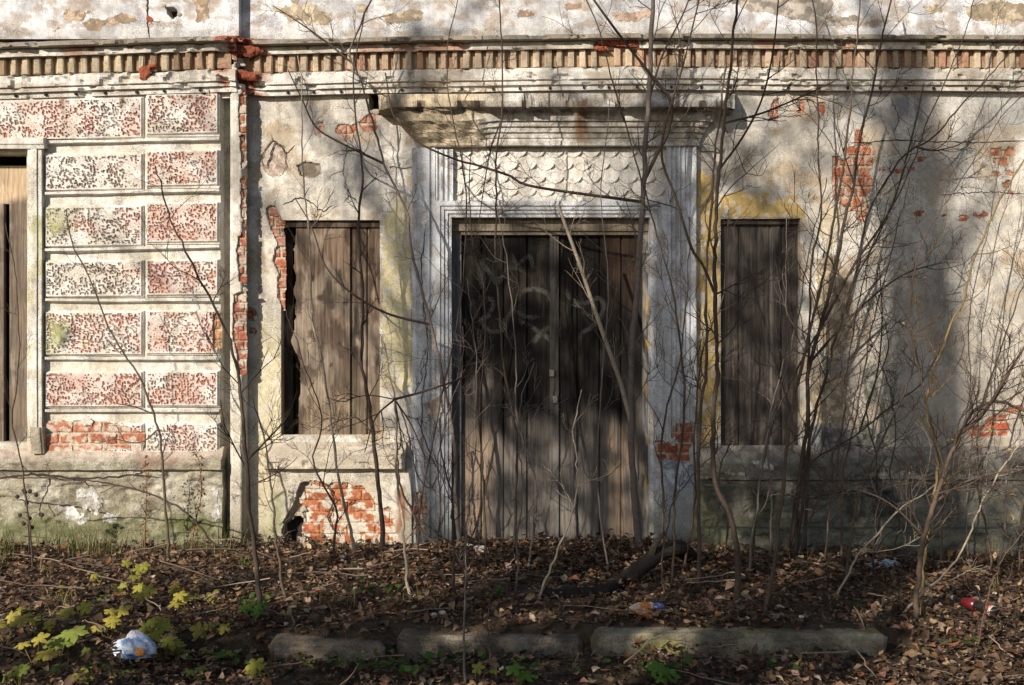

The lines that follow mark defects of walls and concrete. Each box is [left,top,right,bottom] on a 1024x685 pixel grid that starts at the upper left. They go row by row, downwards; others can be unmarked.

flaking render [313,109,393,137]
flaking render [990,144,1017,199]
flaking render [213,43,281,446]
flaking render [268,201,287,311]
peeling [803,130,927,447]
flaking render [941,210,988,221]
peeling [655,170,804,489]
flaking render [44,417,146,452]
flaking render [966,406,1024,437]
flaking render [296,475,399,544]